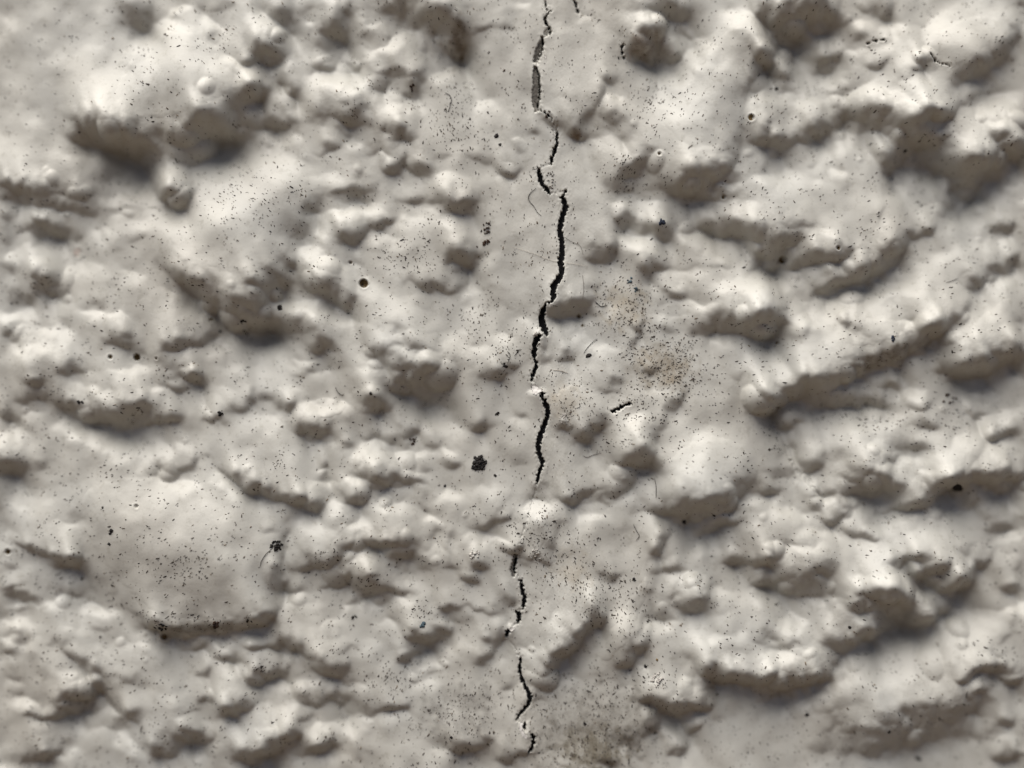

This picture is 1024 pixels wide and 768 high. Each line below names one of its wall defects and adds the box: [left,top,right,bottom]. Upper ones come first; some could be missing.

crack [530,3,569,483]
crack [505,554,536,753]